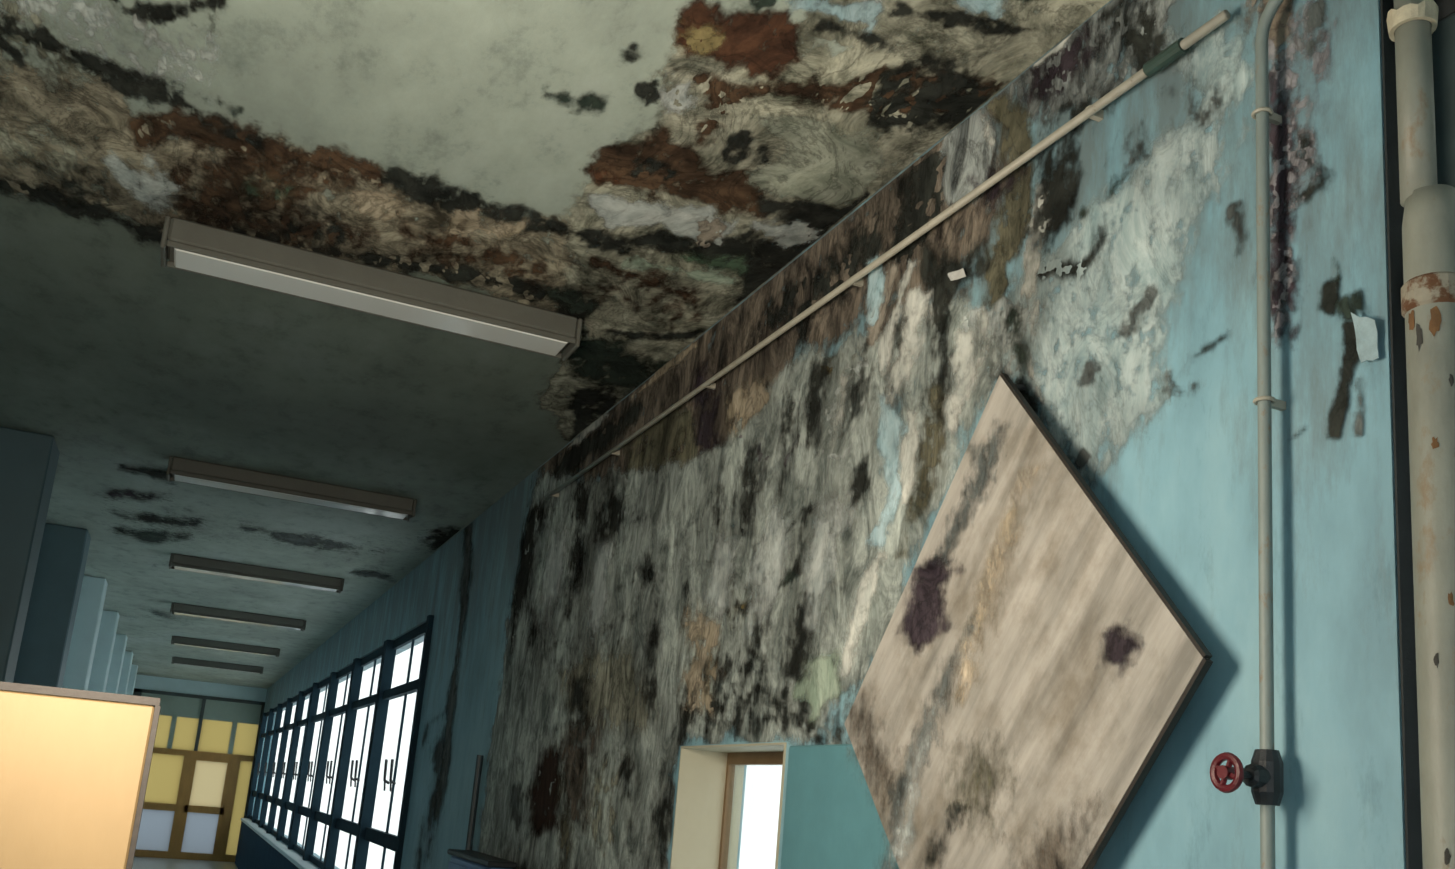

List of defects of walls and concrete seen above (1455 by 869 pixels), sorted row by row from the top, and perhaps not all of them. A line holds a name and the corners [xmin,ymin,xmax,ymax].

rust [675,0,799,80]
spalling [0,0,1110,441]
leakage [531,0,1176,570]
leakage [1225,202,1243,251]
leakage [1245,0,1336,341]
peeling [1319,274,1379,439]
rust [1408,306,1442,350]
leakage [106,464,201,544]
leakage [242,527,357,553]
leakage [843,427,1038,869]
leakage [1103,626,1143,666]
leakage [509,712,632,869]